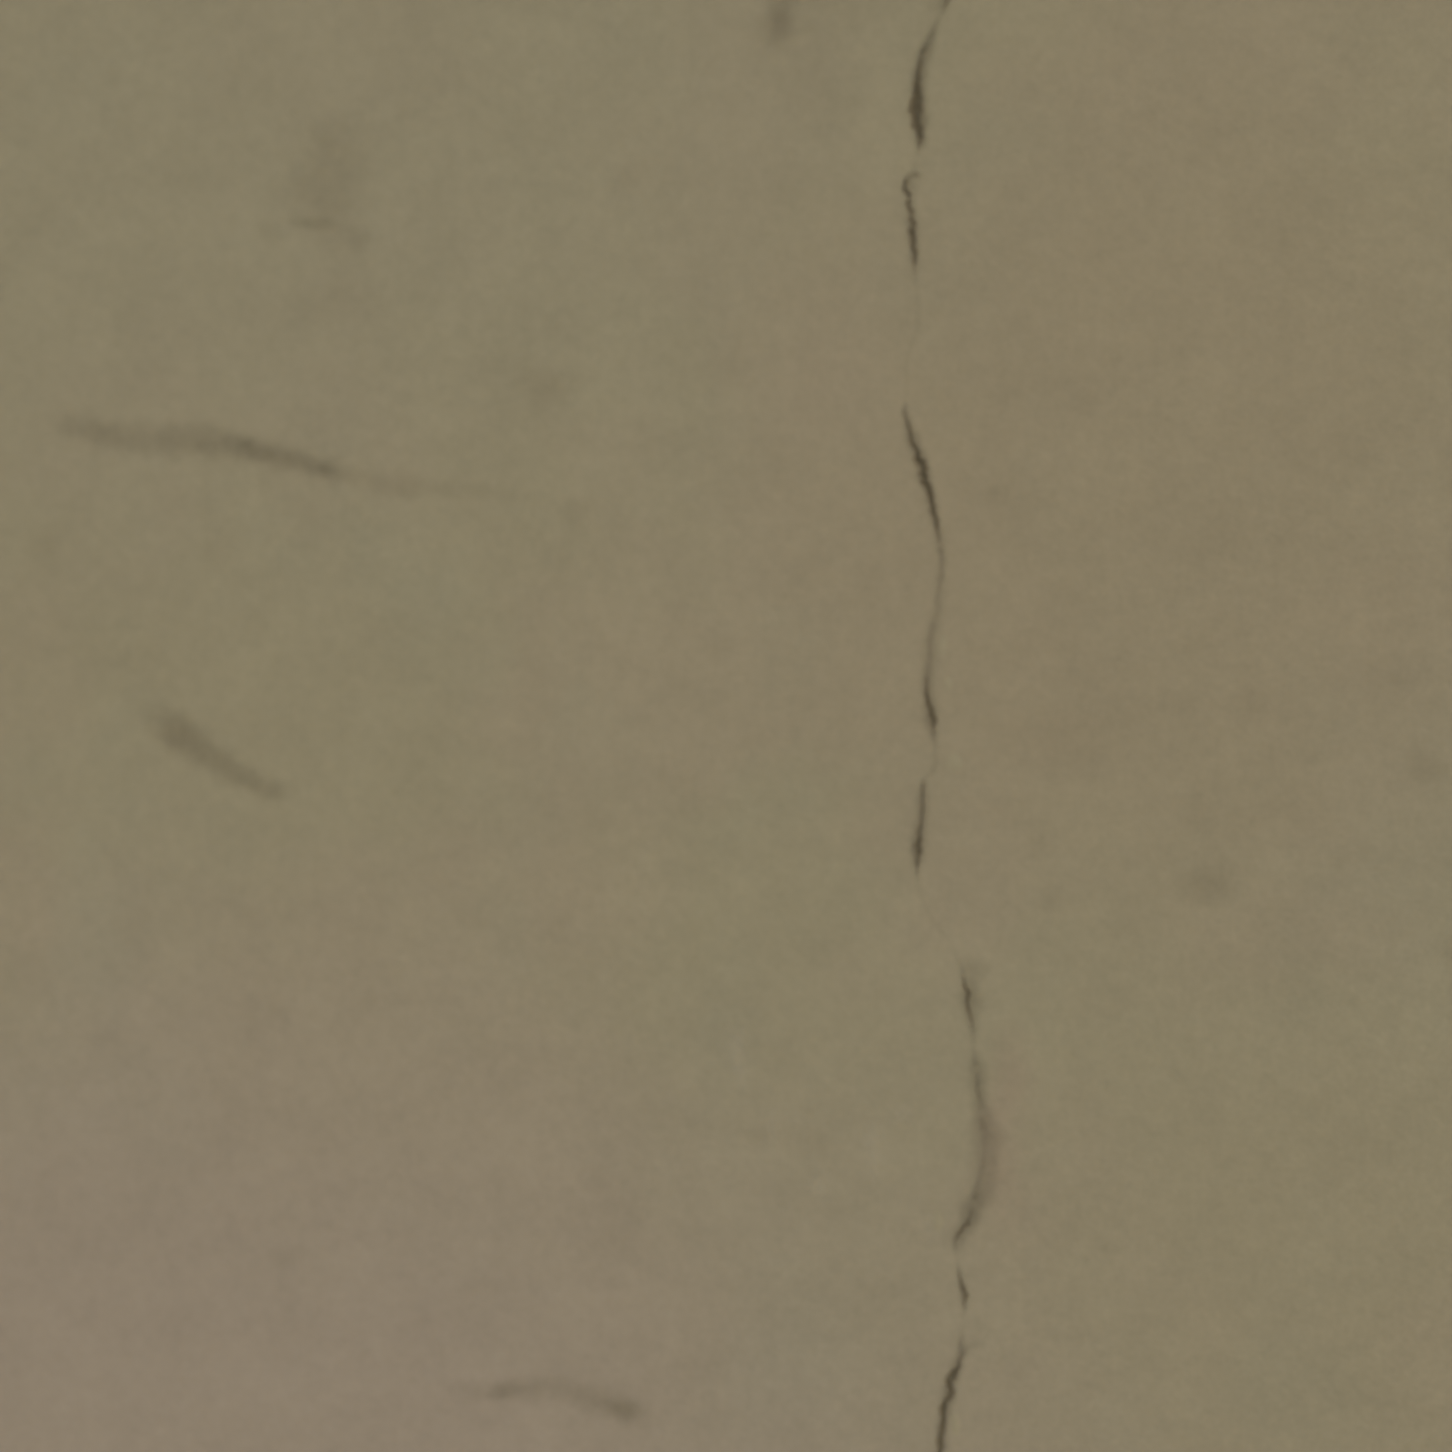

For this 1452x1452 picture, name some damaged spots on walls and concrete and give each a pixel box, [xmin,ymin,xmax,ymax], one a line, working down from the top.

crack [898,52,924,268]
crack [904,414,940,542]
crack [913,635,963,872]
crack [962,977,983,1030]
crack [932,1207,973,1307]
crack [935,1356,962,1452]